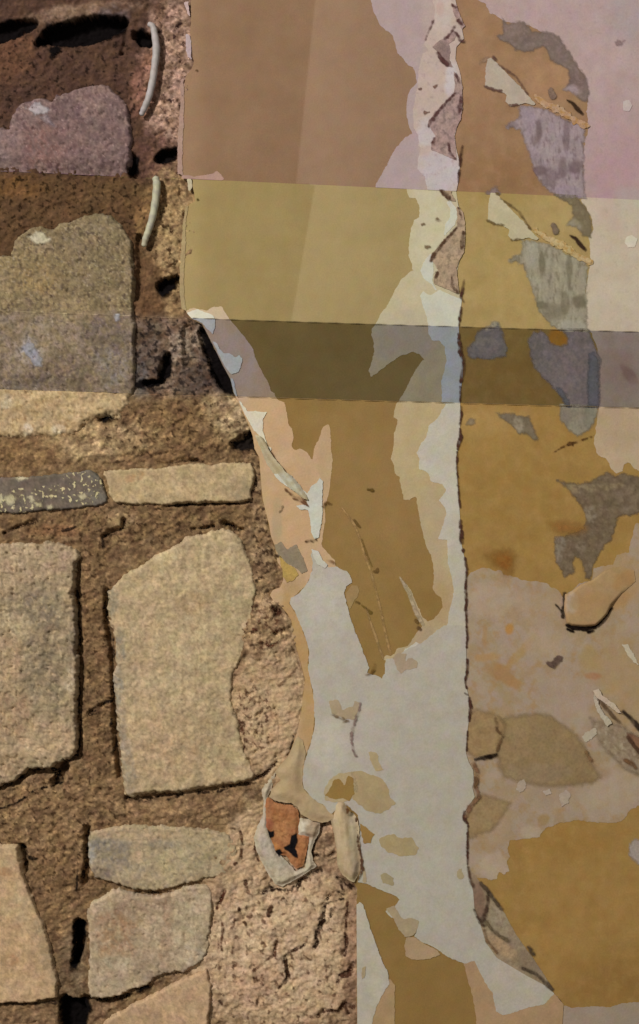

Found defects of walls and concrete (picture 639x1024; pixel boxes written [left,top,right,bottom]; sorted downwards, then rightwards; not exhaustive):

crack [456,145,464,178]
peeling [182,0,639,1024]
crack [456,288,502,788]
crack [555,592,613,633]
crack [461,813,469,864]